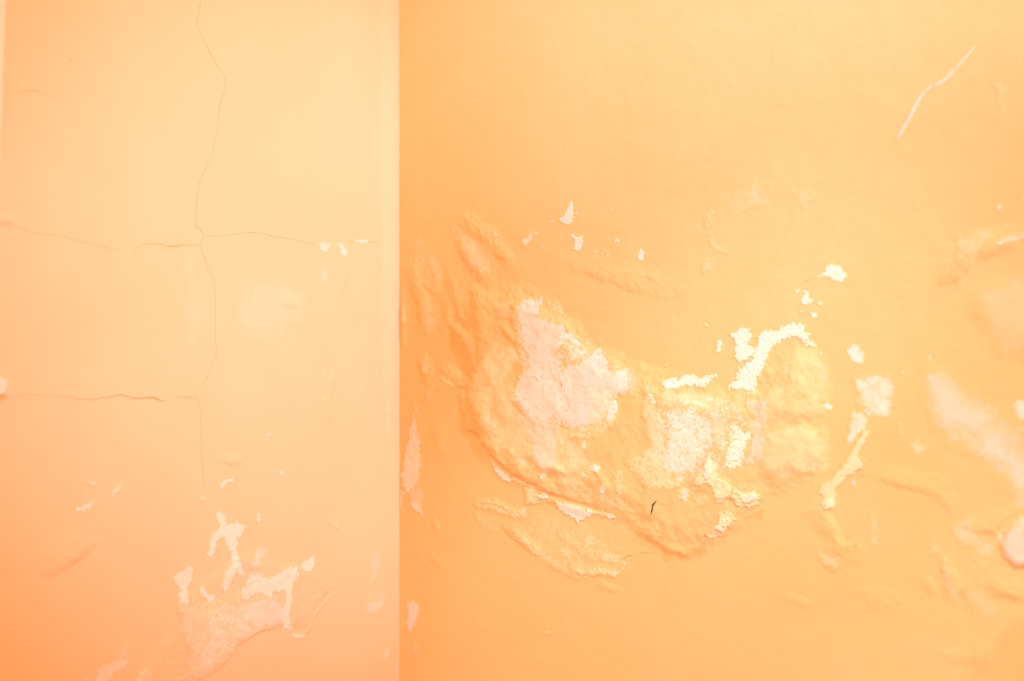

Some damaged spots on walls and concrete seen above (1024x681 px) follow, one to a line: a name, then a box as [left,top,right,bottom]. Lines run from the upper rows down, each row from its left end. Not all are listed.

crack [6,1,312,490]
peeling [550,200,646,262]
peeling [794,289,823,320]
spalling [399,404,425,517]
spalling [469,290,765,584]
peeling [816,342,899,513]
peeling [171,508,317,681]